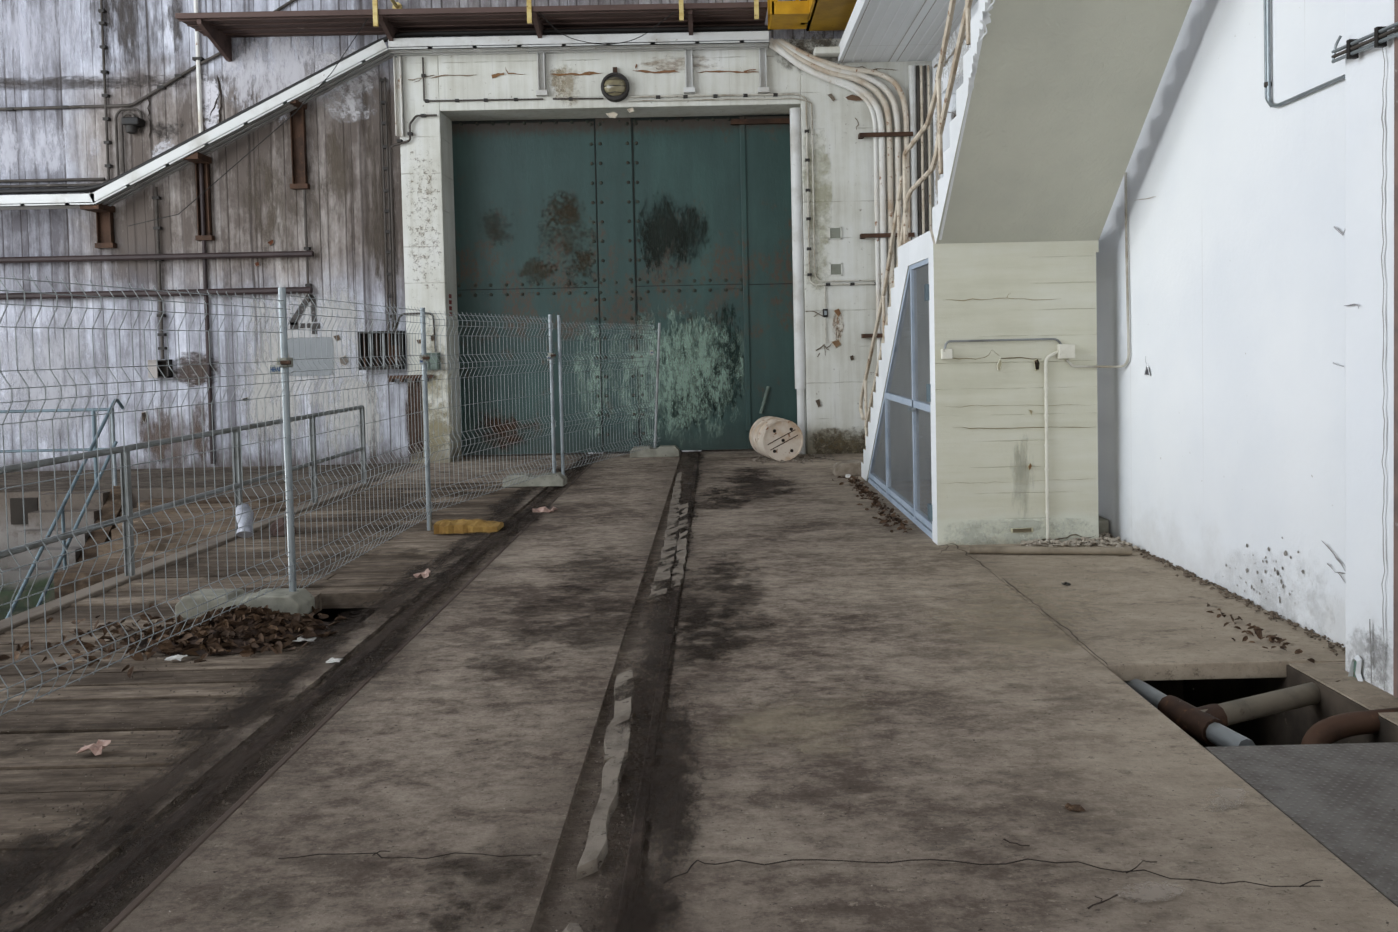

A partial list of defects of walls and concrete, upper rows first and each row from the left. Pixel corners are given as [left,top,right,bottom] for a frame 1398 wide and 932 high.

water stain [91,0,181,57]
water stain [1225,537,1304,603]
crack [663,839,1323,909]